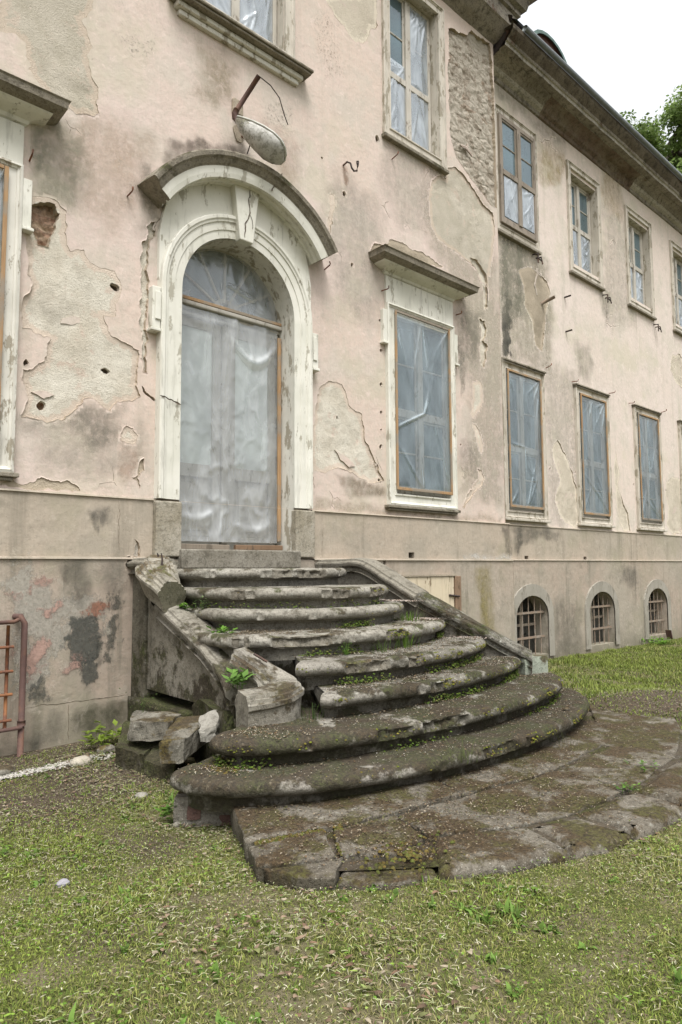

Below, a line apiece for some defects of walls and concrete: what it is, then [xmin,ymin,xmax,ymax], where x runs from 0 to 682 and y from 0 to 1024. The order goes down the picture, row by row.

crack [244,174,282,236]
peeling [20,196,141,424]
peeling [370,166,551,501]
water stain [500,237,524,356]
peeling [313,380,384,484]
water stain [0,553,125,700]